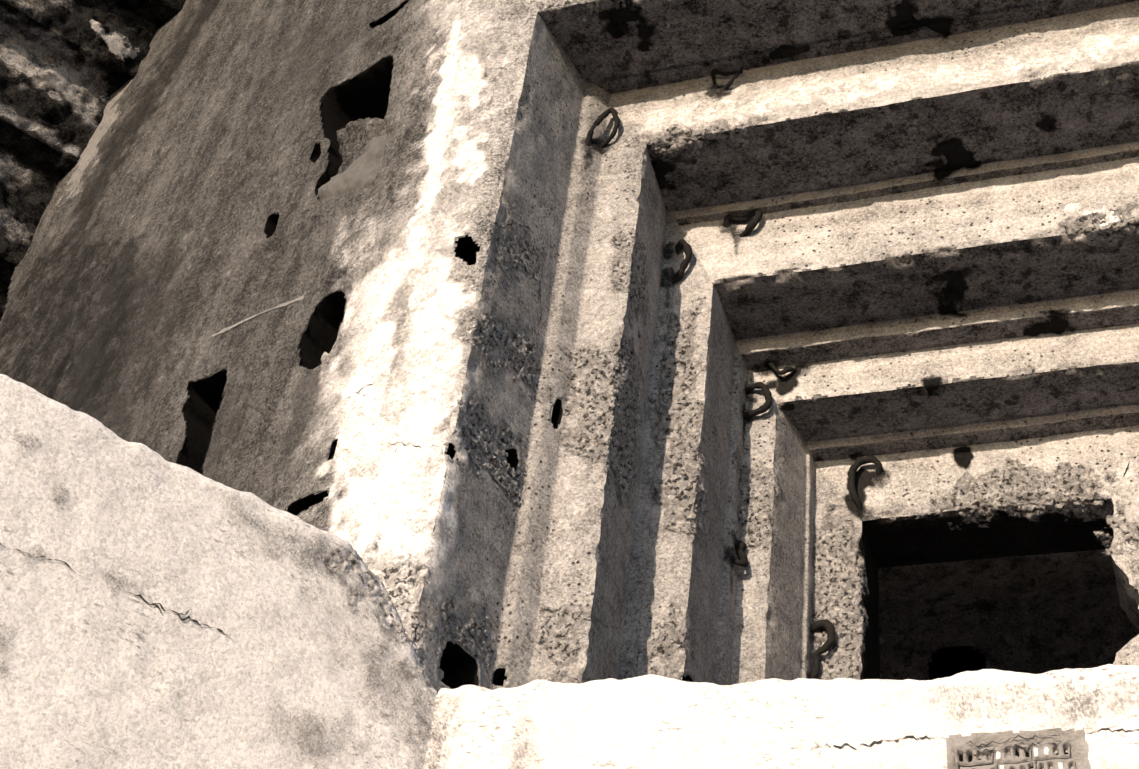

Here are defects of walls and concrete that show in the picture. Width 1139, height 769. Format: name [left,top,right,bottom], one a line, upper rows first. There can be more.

spalling [261,209,283,242]
corrosion [720,224,742,254]
peeling [282,15,712,694]
corrosion [755,360,810,411]
corrosion [742,385,756,442]
corrosion [844,454,889,523]
spalling [882,458,1139,590]
crack [14,549,75,572]
crack [129,592,230,637]
crack [1086,726,1139,734]